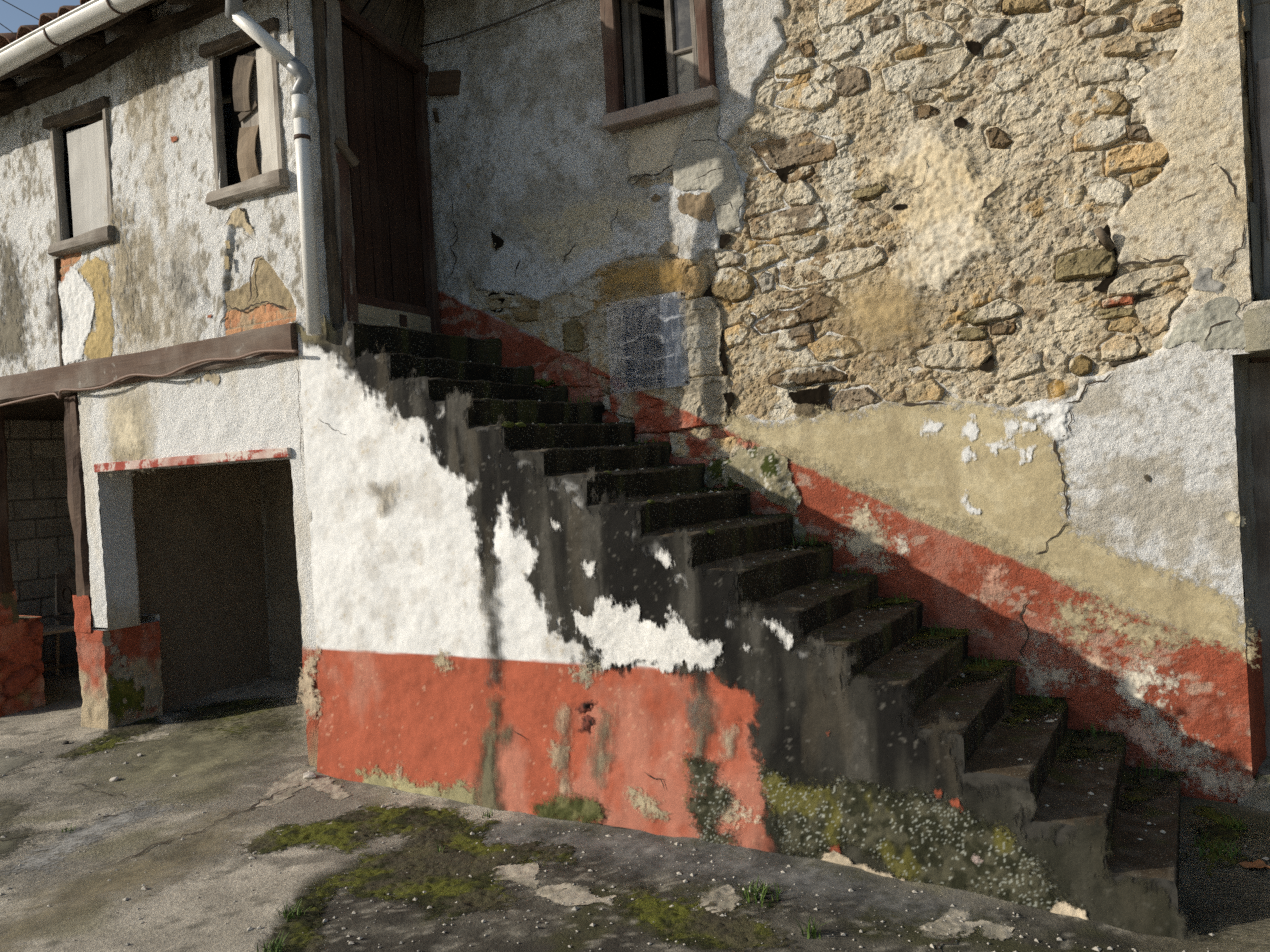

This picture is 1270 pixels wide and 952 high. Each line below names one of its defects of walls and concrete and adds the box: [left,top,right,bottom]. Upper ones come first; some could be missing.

spalling [965,41,982,55]
spalling [775,164,796,183]
peeling [59,252,115,359]
peeling [208,255,297,336]
spalling [703,284,728,375]
spalling [1093,224,1119,293]
leakage [479,560,502,685]
peeling [723,374,1257,800]
crack [1019,594,1035,660]
leakage [474,701,511,811]
leakage [555,707,570,796]
leakage [686,663,734,759]